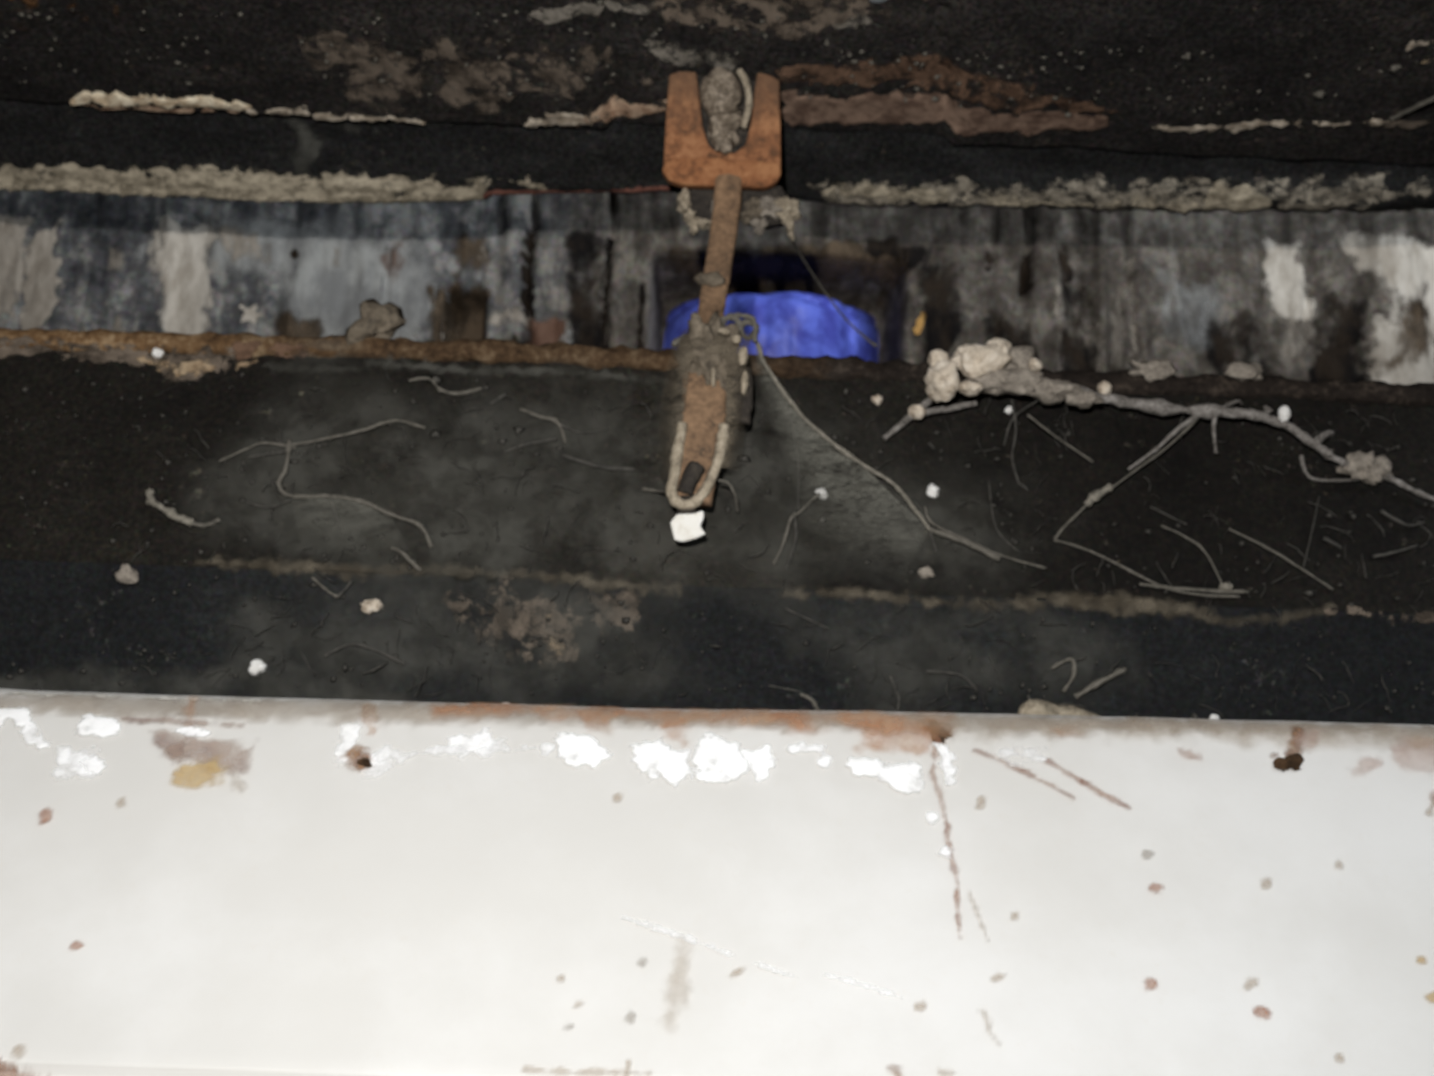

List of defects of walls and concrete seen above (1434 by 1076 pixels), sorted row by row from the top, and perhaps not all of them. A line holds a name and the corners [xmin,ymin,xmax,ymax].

spalling [527,0,892,40]
peeling [69,30,667,156]
peeling [641,40,735,85]
spalling [0,162,491,204]
damp [110,215,615,348]
damp [919,263,962,361]
damp [1262,239,1316,358]
damp [1341,232,1434,385]
corrosion [132,718,244,786]
corrosion [334,723,392,777]
corrosion [839,711,951,747]
corrosion [0,1063,23,1076]